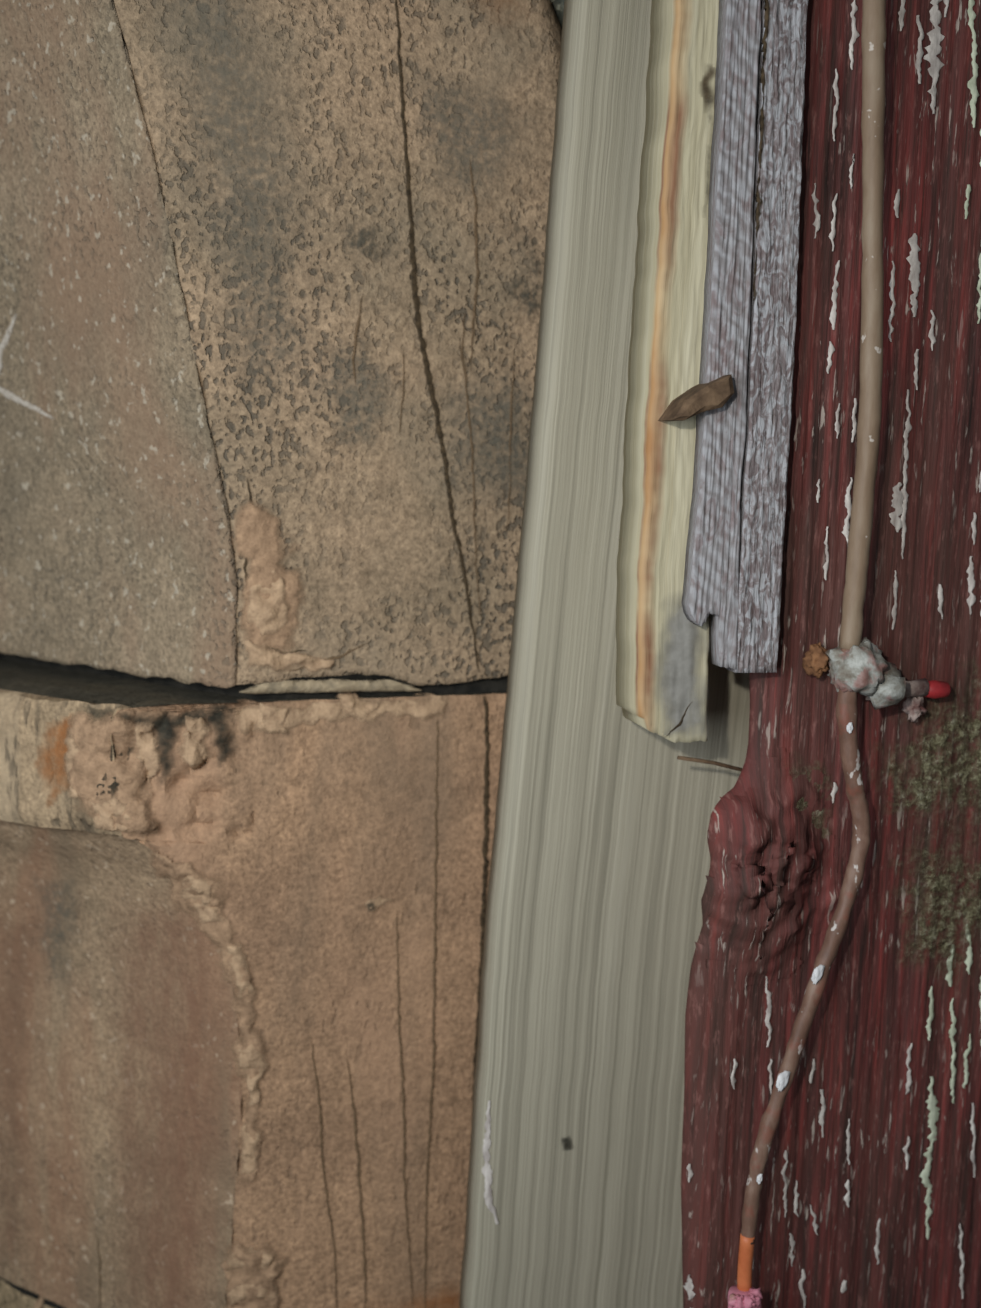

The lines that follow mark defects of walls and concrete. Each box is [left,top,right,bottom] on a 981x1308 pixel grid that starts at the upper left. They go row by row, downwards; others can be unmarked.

peeling [832,0,860,141]
peeling [898,0,949,114]
peeling [967,0,981,136]
crack [352,297,362,379]
crack [395,0,490,1102]
crack [506,358,514,527]
peeling [811,154,855,374]
peeling [888,233,936,630]
spalling [64,713,269,1183]
crack [311,1041,366,1308]
crack [396,722,439,1308]
peeling [902,924,981,1239]